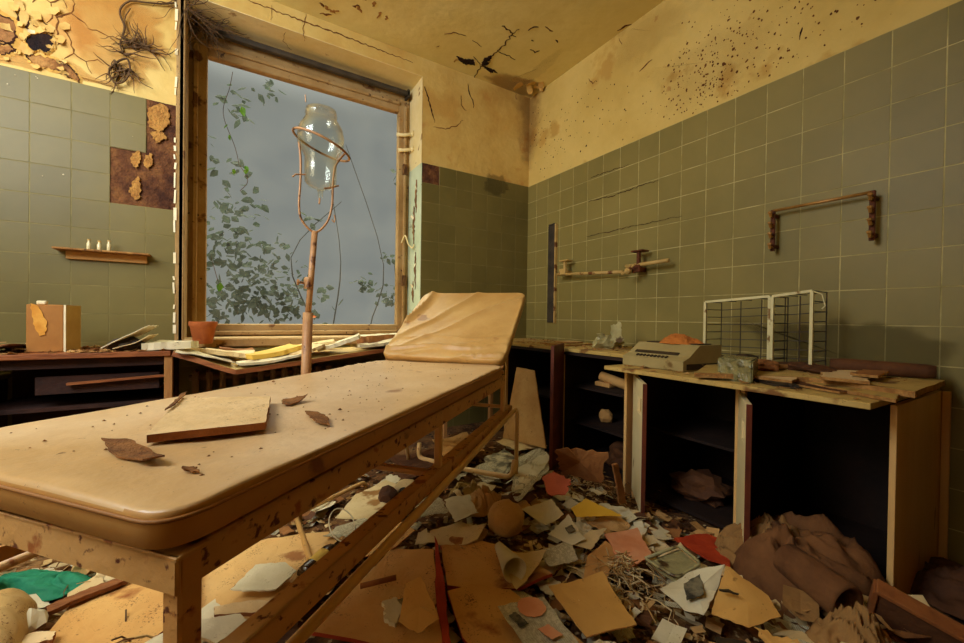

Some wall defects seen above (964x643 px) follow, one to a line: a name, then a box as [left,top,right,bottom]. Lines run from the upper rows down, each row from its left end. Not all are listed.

flaking render [0,0,83,84]
crack [15,0,111,74]
crack [424,26,519,129]
mould [642,0,825,119]
peeling [110,77,178,232]